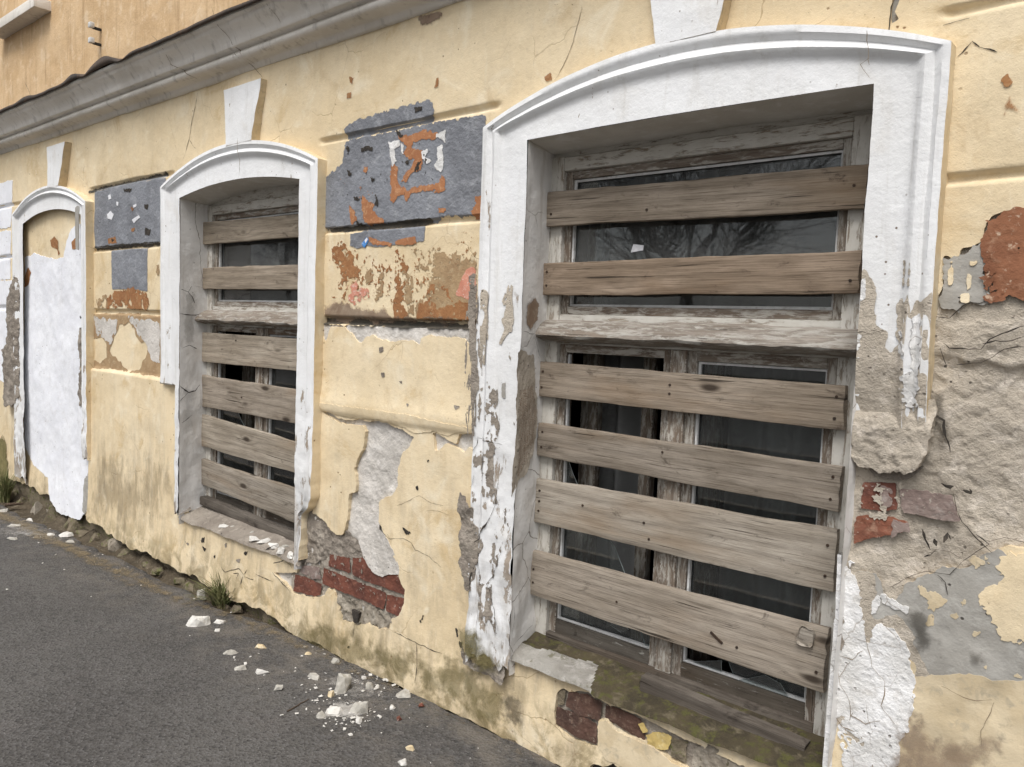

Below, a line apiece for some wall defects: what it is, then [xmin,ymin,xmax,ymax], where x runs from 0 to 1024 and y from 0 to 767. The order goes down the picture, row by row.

spalling [1,268,31,408]
peeling [77,286,161,408]
peeling [324,129,538,634]
crack [940,326,1024,366]
spalling [236,412,414,629]
spalling [833,207,1024,767]
spalling [455,628,505,685]
spalling [556,689,744,767]